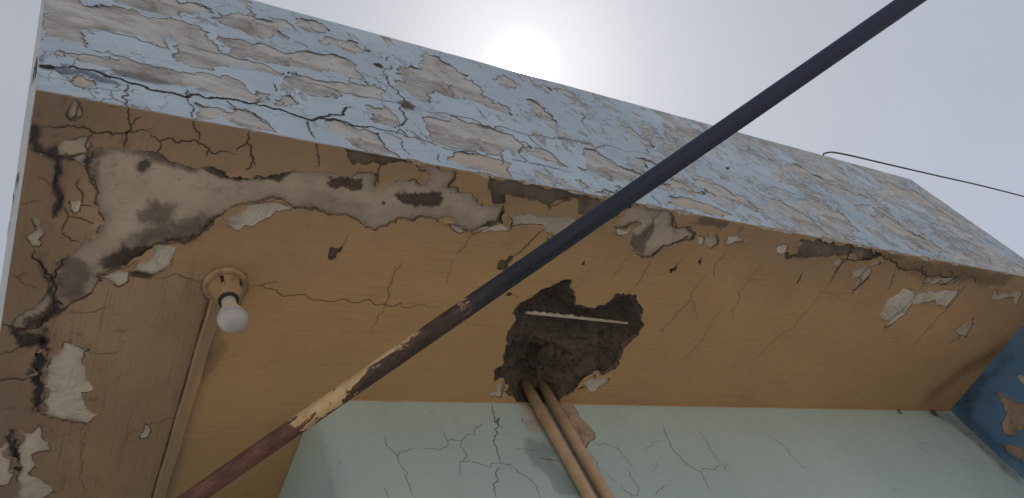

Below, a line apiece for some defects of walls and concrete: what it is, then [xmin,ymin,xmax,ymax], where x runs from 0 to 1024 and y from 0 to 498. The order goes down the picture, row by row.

water stain [29,125,103,217]
water stain [101,204,218,278]
water stain [186,166,293,182]
crack [0,57,637,381]
spalling [0,0,657,498]
water stain [327,176,363,191]
water stain [382,191,456,208]
spalling [612,177,1024,329]
water stain [11,261,88,410]
crack [385,403,561,497]
crack [589,428,732,496]
peeling [994,388,1024,466]